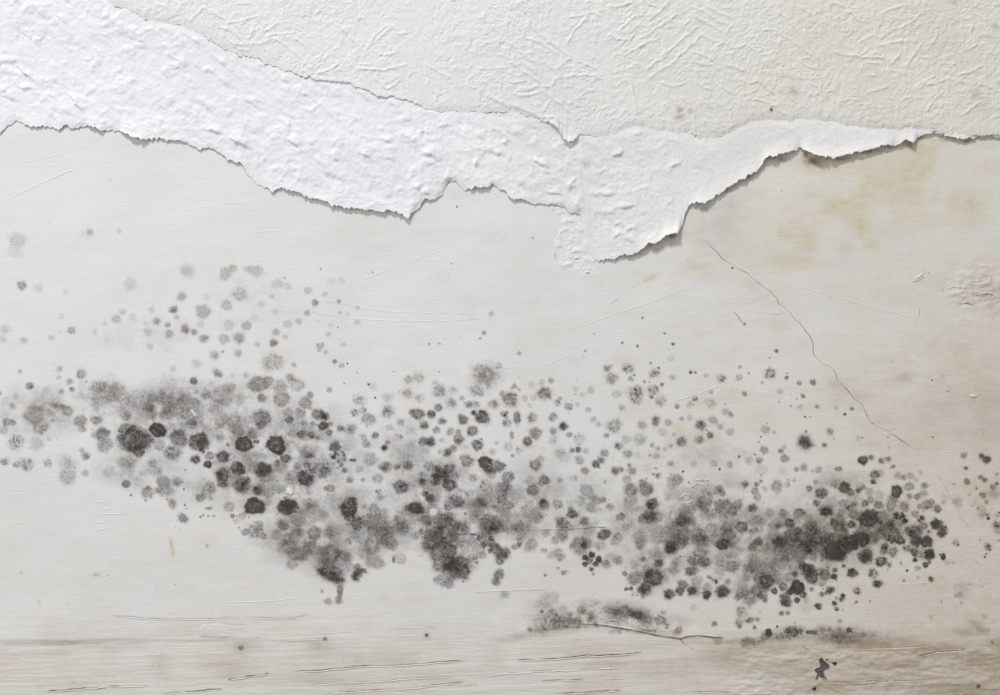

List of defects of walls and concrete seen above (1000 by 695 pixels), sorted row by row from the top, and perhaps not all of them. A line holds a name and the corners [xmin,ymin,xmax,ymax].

damp [75,384,290,516]
damp [277,497,366,595]
damp [296,396,356,485]
damp [340,497,404,549]
damp [400,393,531,585]
damp [573,455,949,644]
damp [798,431,825,449]
damp [540,610,594,630]